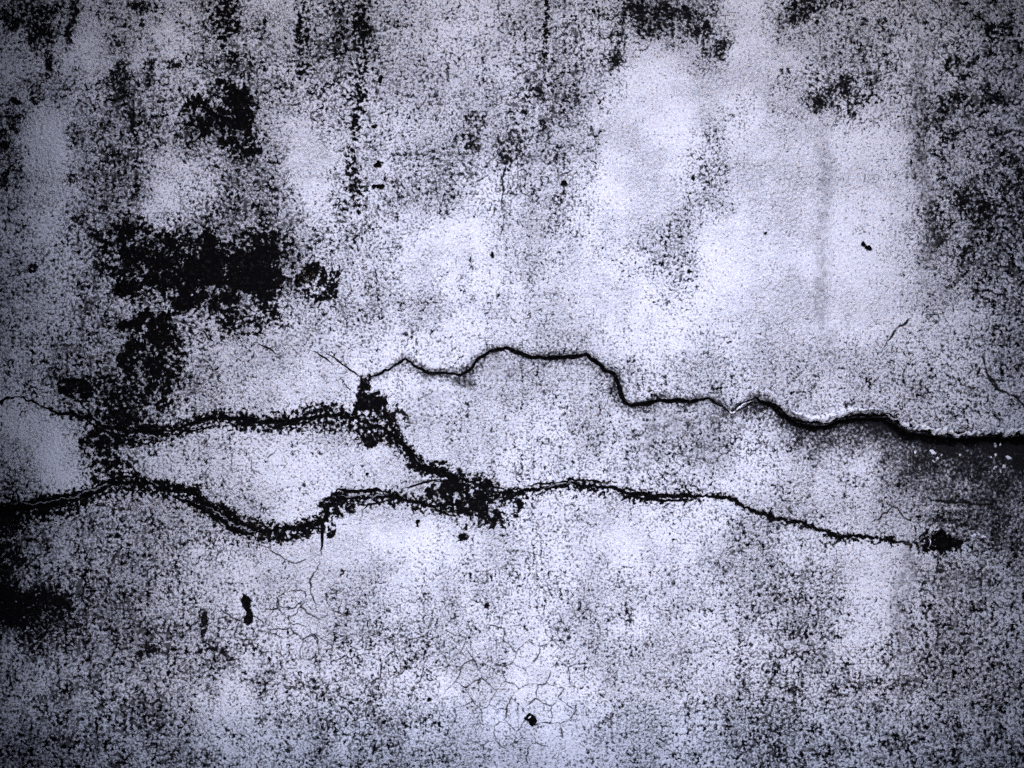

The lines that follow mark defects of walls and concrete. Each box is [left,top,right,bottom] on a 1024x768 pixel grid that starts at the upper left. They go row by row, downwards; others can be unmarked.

water stain [128,105,138,130]
water stain [54,203,341,487]
crack [0,345,1024,766]